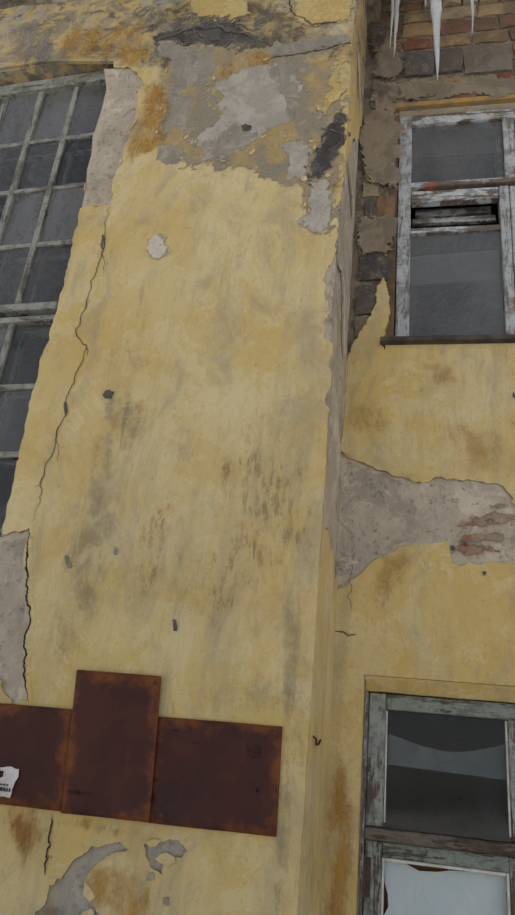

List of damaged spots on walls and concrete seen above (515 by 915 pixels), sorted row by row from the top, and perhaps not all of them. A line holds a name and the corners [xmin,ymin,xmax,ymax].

crack [158,24,257,46]
crack [268,0,361,216]
flaking render [145,0,515,589]
crack [23,203,113,703]
flaking render [0,531,30,704]
corrosion [11,814,31,853]
flaking render [36,842,129,915]
flaking render [145,839,187,881]